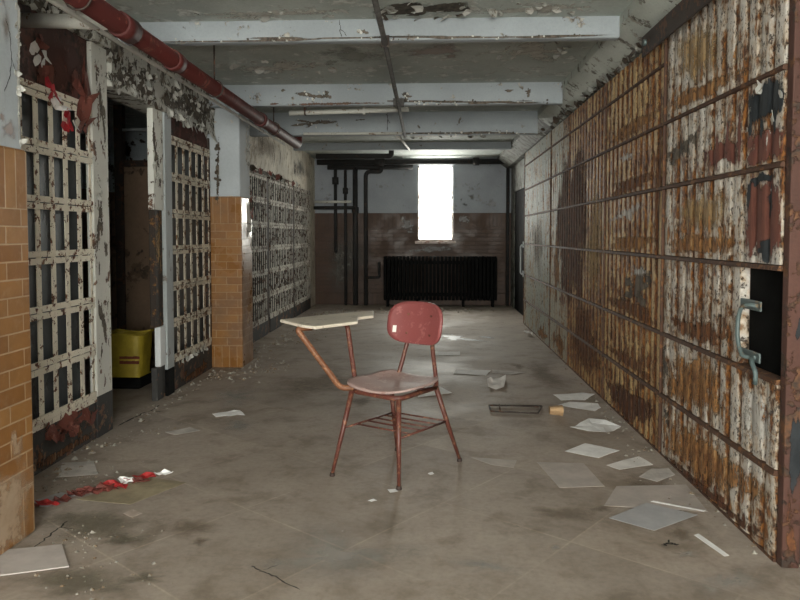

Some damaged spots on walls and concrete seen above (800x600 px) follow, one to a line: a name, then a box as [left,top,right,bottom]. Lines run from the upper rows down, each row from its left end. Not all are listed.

spalling [373,0,590,21]
peeling [14,0,221,202]
peeling [296,90,331,101]
peeling [395,37,642,139]
rust [673,26,740,111]
rust [609,87,741,270]
peeling [704,78,784,263]
peeling [96,179,108,273]
peeling [98,300,109,358]
rust [538,150,657,423]
rust [671,289,729,346]
crack [252,564,299,589]